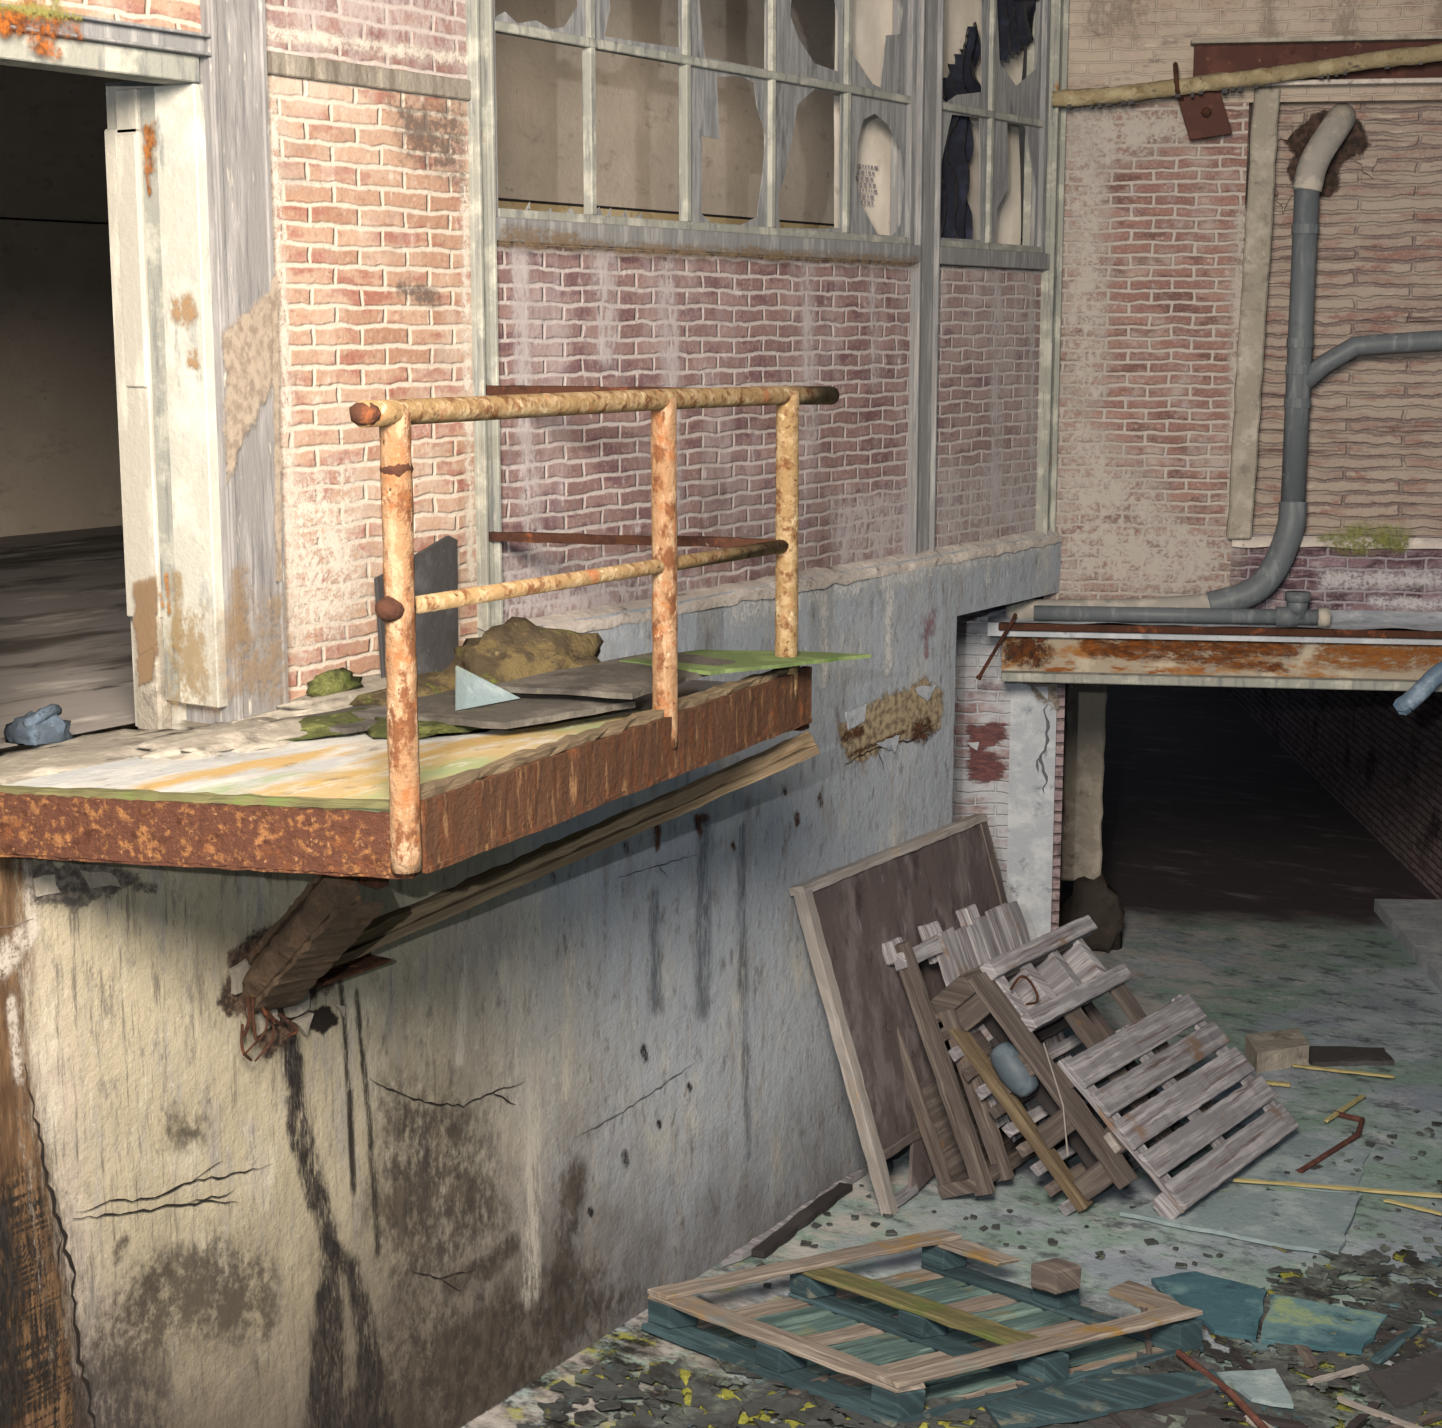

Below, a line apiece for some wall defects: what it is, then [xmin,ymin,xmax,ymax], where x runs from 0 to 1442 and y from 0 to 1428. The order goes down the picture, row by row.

rust [143,124,156,195]
spalling [1274,110,1328,213]
spalling [1319,119,1377,197]
damp [798,104,1246,688]
damp [502,418,652,620]
rust [1004,636,1052,668]
rust [1077,638,1442,672]
spalling [838,676,944,764]
spalling [966,722,1009,784]
damp [280,914,631,1428]
damp [0,1165,275,1428]
crack [25,1065,270,1428]